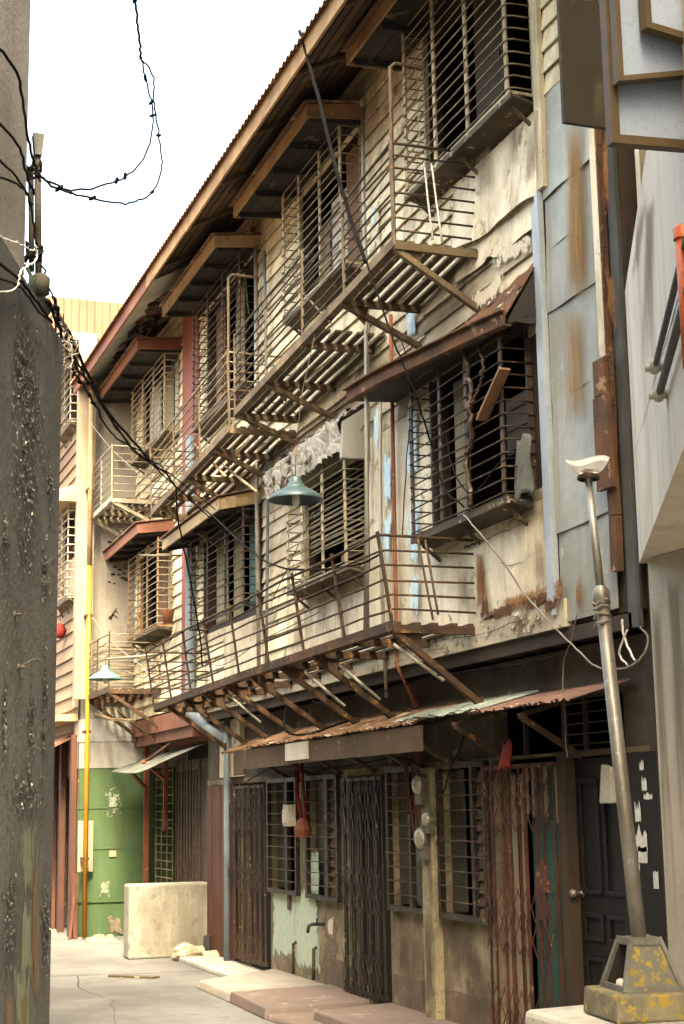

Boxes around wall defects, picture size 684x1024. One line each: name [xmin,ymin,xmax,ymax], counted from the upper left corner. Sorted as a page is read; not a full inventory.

corrosion [568,147,585,278]
corrosion [567,324,582,403]
spalling [268,408,350,494]
corrosion [476,554,490,623]
corrosion [544,580,563,613]
peeling [105,785,121,817]
leakage [7,825,39,1024]
crack [71,974,116,1024]